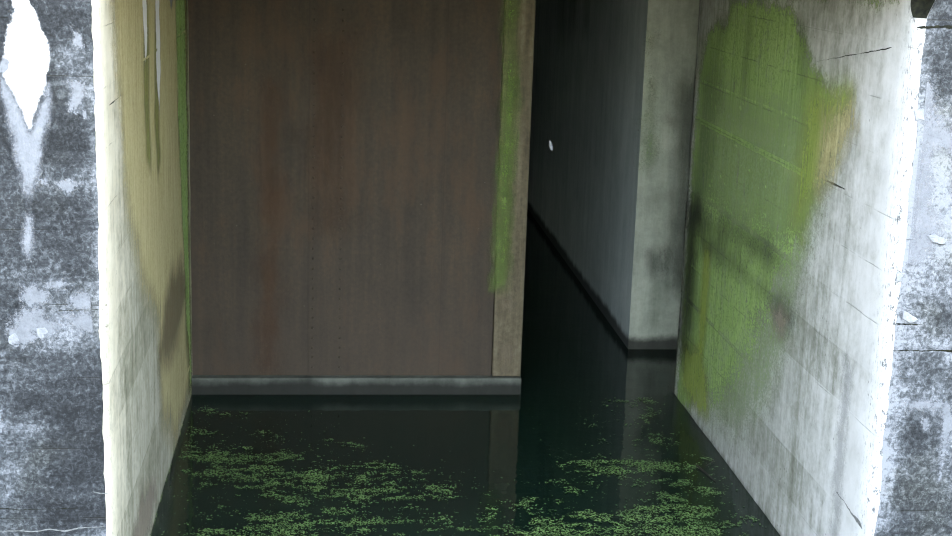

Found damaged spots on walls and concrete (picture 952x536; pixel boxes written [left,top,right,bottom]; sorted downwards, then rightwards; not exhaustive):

crack [917,23,952,31]
damp [798,94,845,214]
flaking render [895,78,952,283]
flaking render [902,311,918,323]